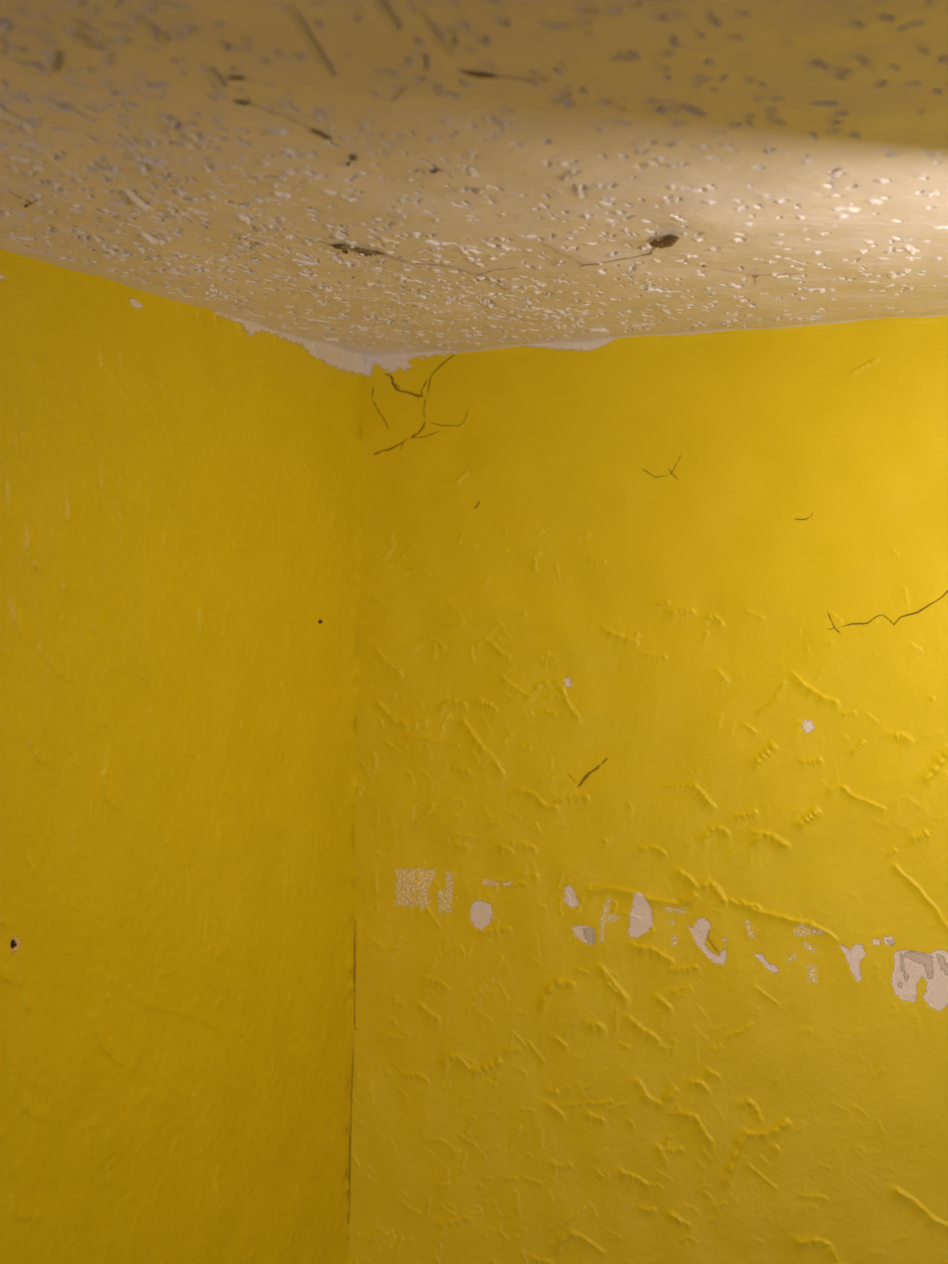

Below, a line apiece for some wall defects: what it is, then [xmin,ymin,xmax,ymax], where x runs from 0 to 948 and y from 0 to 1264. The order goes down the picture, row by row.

crack [372,354,469,455]
crack [828,591,948,633]
peeling [470,900,493,930]
peeling [564,886,579,907]
peeling [573,925,595,945]
peeling [628,893,653,938]
peeling [687,918,727,964]
peeling [756,953,779,973]
peeling [839,936,948,1012]